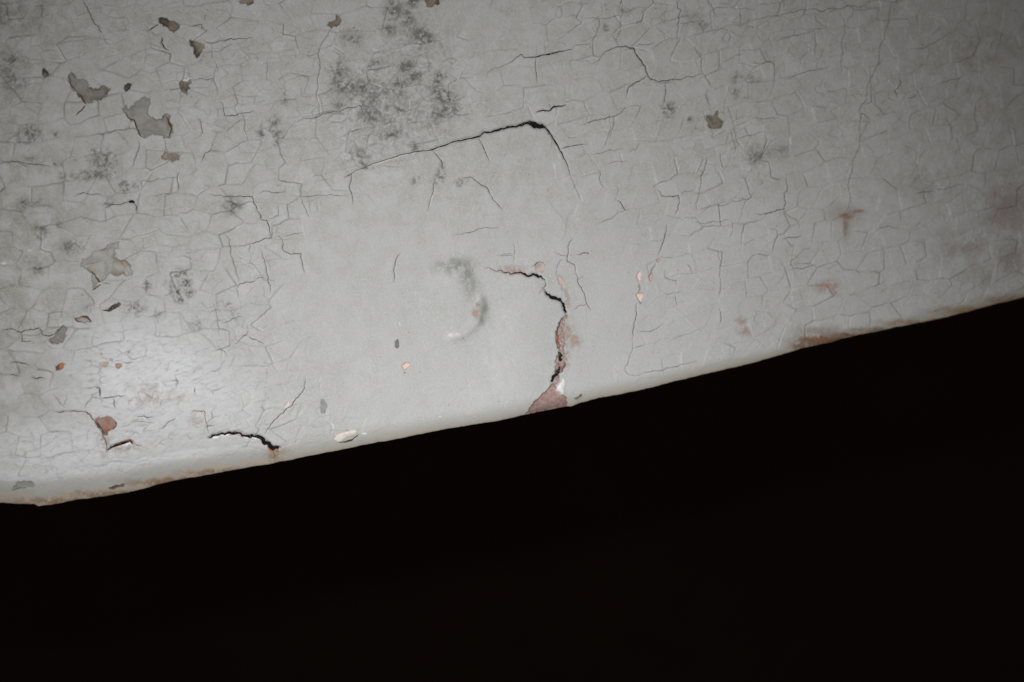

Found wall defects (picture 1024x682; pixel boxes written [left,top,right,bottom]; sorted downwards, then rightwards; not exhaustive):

water stain [386,0,432,42]
peeling [68,72,110,115]
peeling [123,97,173,138]
crack [212,1,710,382]
peeling [81,242,132,290]
peeling [526,274,582,414]
crack [6,326,306,454]
peeling [96,416,117,435]
peeling [331,422,367,443]